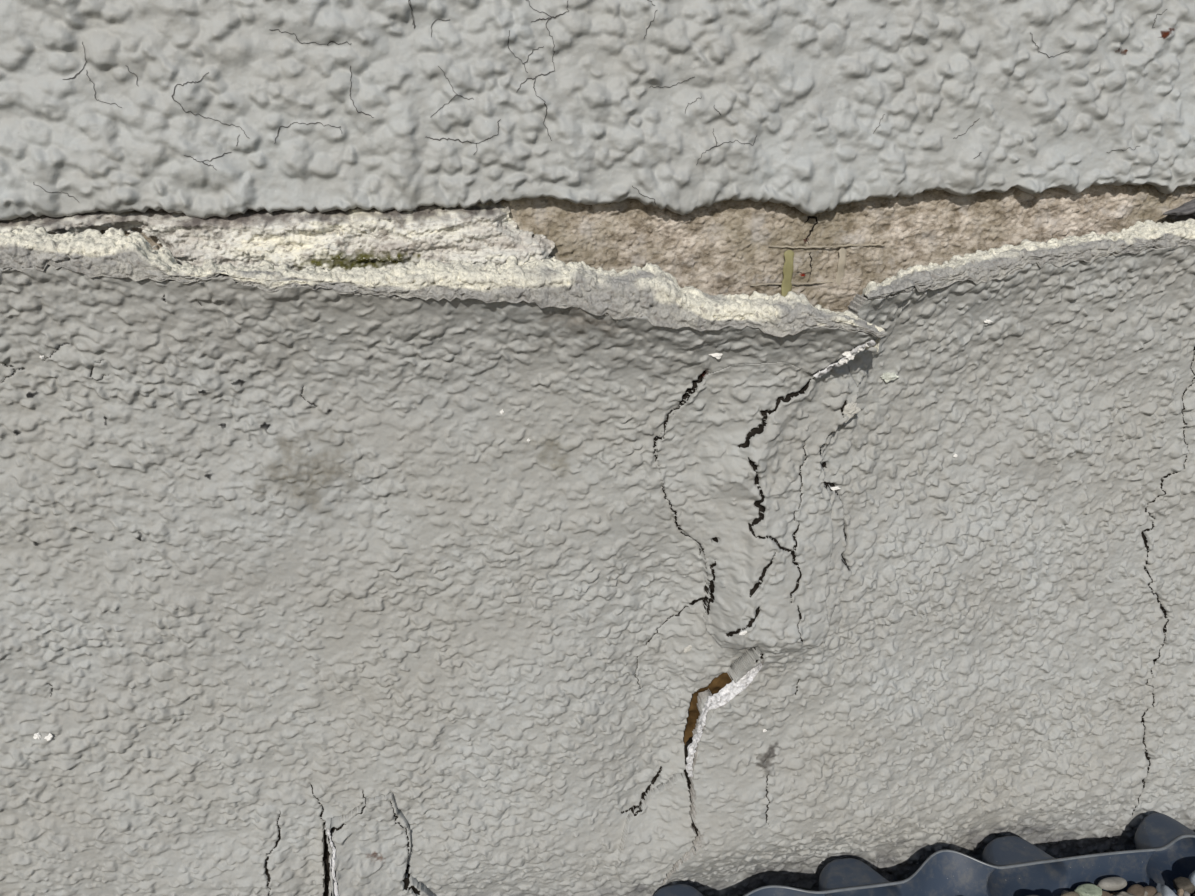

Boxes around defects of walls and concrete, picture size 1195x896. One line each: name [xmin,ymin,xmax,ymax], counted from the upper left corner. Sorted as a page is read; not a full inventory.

flaking render [0,183,1195,896]
crack [635,370,847,689]
crack [1132,346,1195,815]
crack [264,810,281,895]
crack [310,784,420,896]
crack [621,737,698,836]
crack [763,774,771,825]